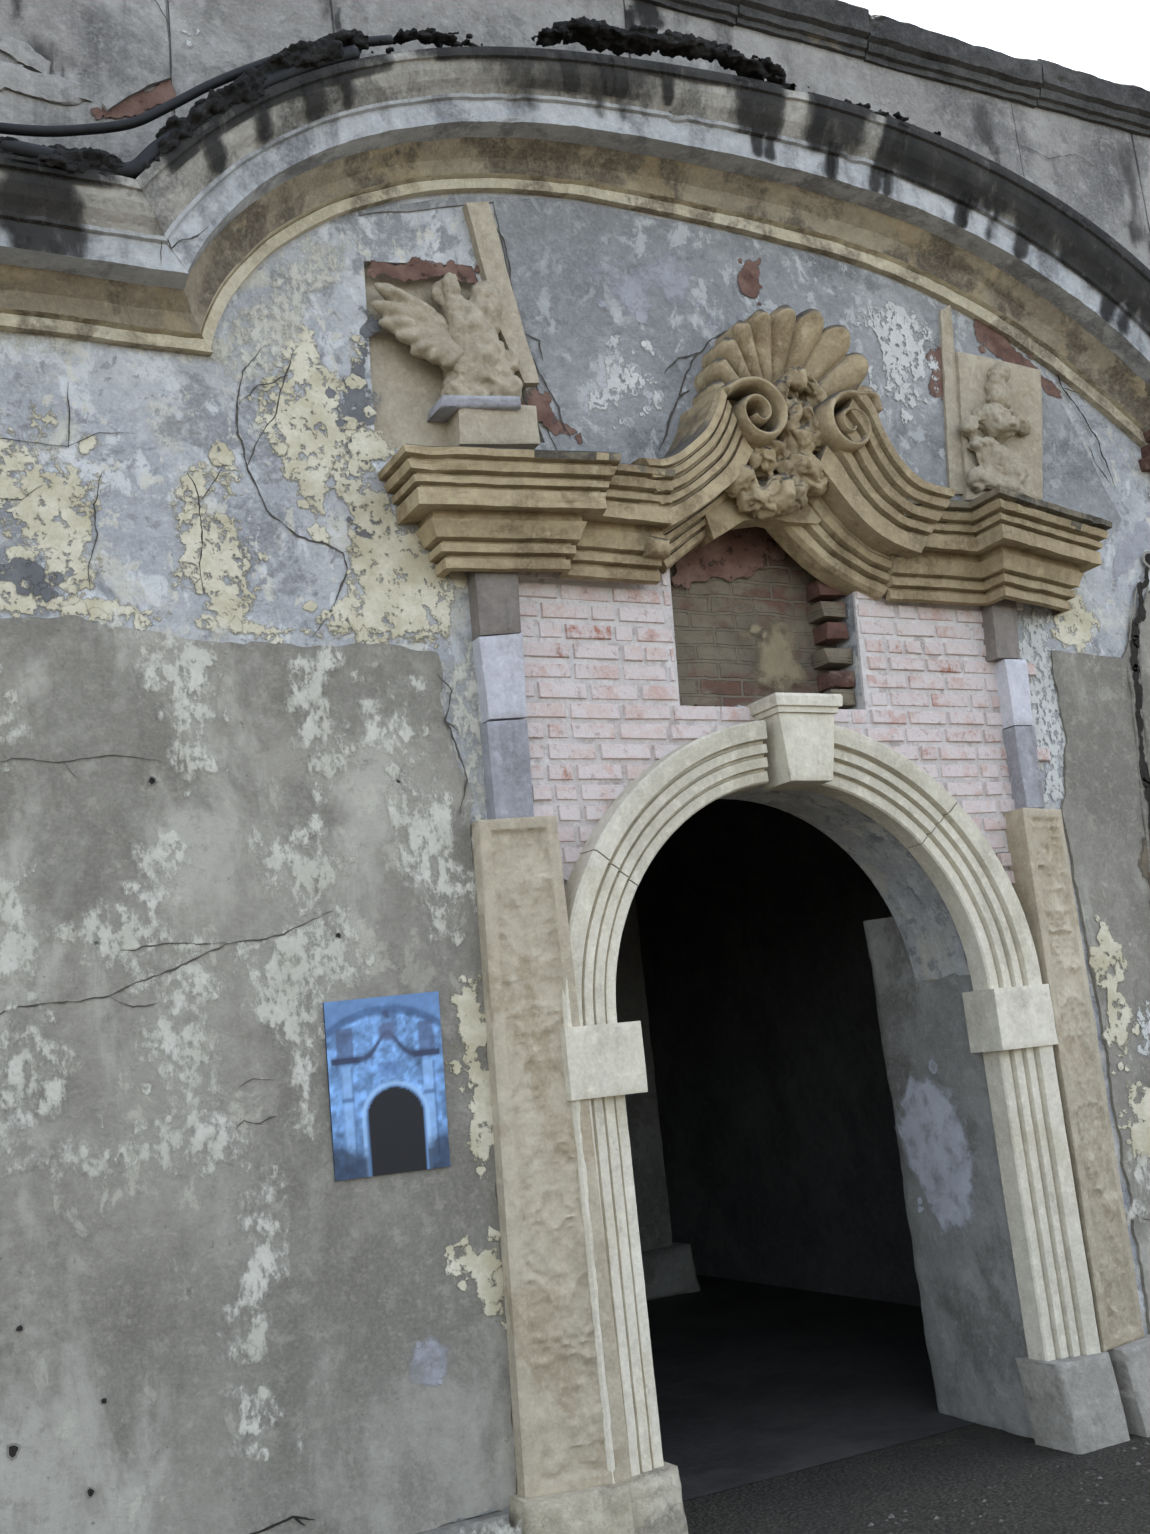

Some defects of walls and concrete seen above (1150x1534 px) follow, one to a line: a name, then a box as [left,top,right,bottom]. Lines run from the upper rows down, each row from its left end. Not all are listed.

damp [0,153,116,258]
damp [416,46,787,160]
damp [598,257,700,323]
damp [807,91,1150,336]
crack [187,345,359,638]
crack [0,754,161,778]
peeling [0,242,486,1364]
crack [1127,566,1150,872]
crack [0,911,333,1015]
peeling [445,974,494,1179]
peeling [1089,915,1150,1224]
peeling [444,1226,507,1329]